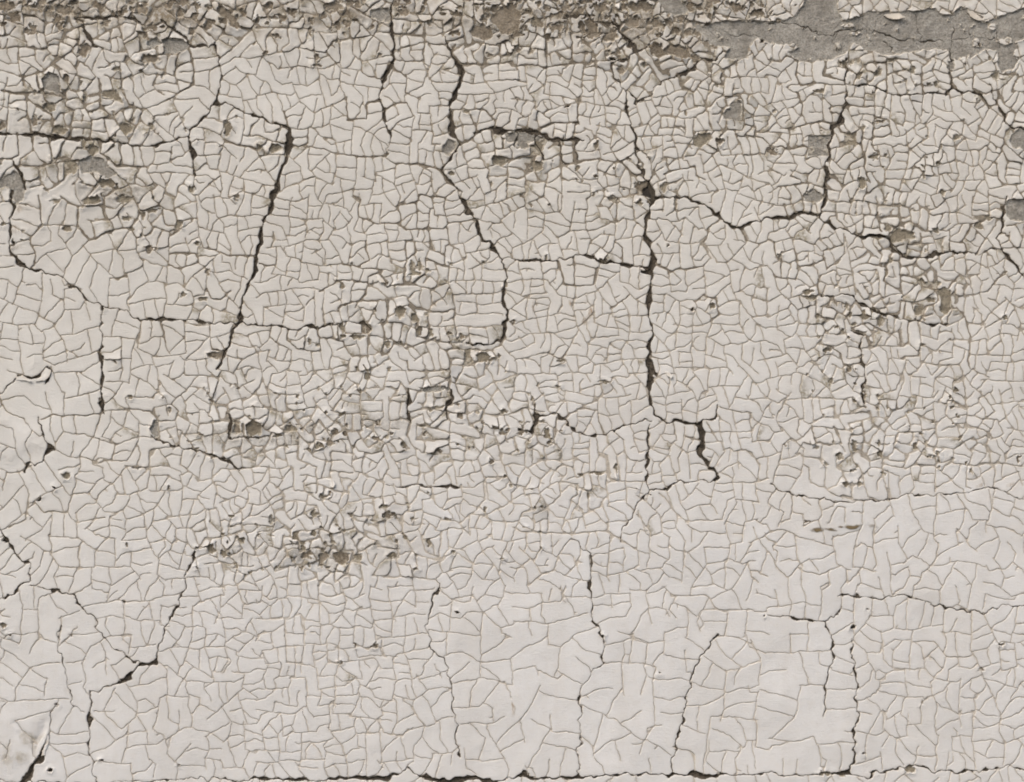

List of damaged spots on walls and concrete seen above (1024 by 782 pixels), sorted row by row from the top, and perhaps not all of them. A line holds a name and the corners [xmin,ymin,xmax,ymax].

crack [781,0,968,37]
crack [874,30,937,49]
peeling [0,0,1024,254]
peeling [862,223,915,277]
peeling [901,276,953,321]
peeling [332,279,562,455]
peeling [232,406,407,453]
peeling [196,479,362,578]
crack [0,653,66,724]
crack [396,587,824,782]
crack [943,677,1024,767]
crack [20,743,46,782]